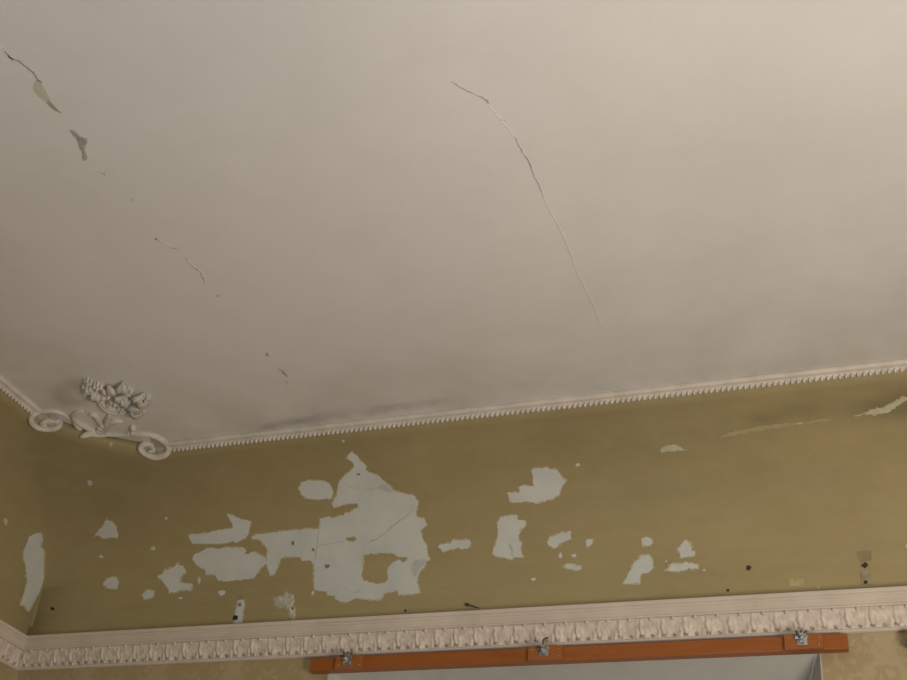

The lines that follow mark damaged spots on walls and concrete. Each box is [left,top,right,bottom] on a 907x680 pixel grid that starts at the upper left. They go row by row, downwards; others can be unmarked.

crack [0,45,107,176]
crack [452,82,603,328]
peeling [507,466,567,505]
peeling [19,532,46,613]
peeling [93,519,119,540]
peeling [142,589,155,600]
peeling [157,451,471,603]
peeling [491,514,527,560]
peeling [547,530,582,572]
peeling [622,536,705,585]